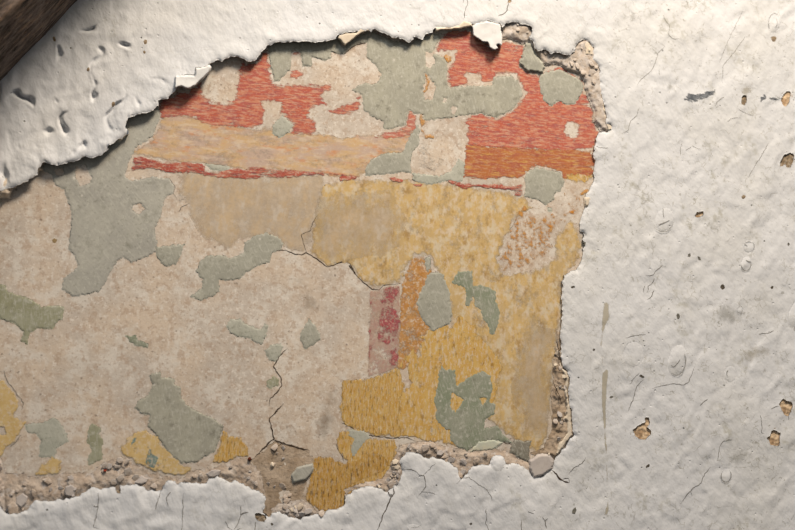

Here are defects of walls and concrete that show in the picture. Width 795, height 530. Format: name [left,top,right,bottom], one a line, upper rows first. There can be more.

spalling [780,151,795,168]
spalling [0,20,610,525]
crack [257,351,307,455]
spalling [779,399,792,416]
spalling [633,417,652,440]
spalling [767,428,780,446]